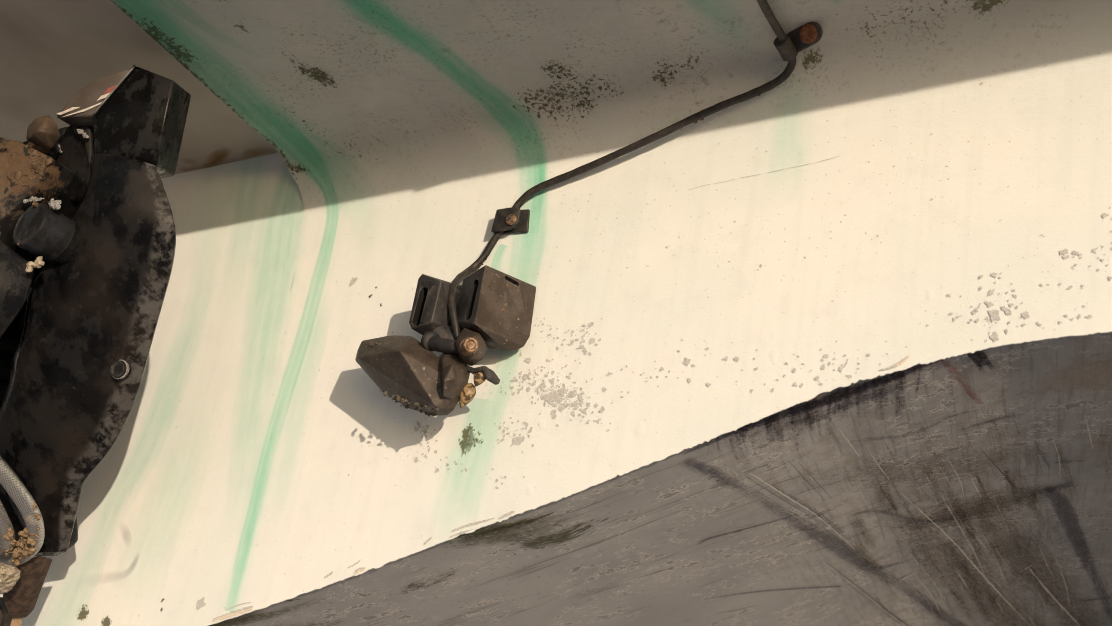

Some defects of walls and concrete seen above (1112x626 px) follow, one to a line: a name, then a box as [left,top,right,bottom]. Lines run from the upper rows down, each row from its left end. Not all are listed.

water stain [966,0,1008,19]
water stain [282,52,337,90]
water stain [646,51,706,87]
water stain [509,60,624,123]